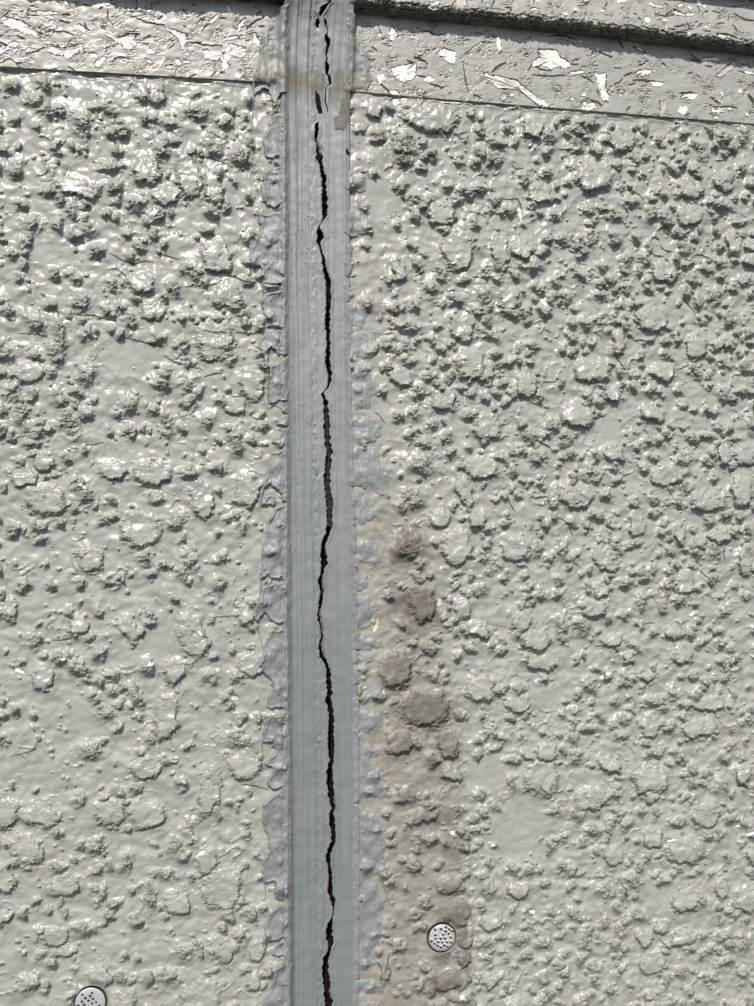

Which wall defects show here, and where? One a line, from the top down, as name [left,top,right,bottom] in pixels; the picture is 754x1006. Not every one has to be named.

peeling [0,3,150,70]
peeling [131,0,265,83]
peeling [379,23,399,41]
peeling [427,0,467,14]
peeling [369,30,666,116]
peeling [558,0,626,28]
peeling [634,0,754,42]
peeling [657,51,754,122]
crack [315,0,350,1006]